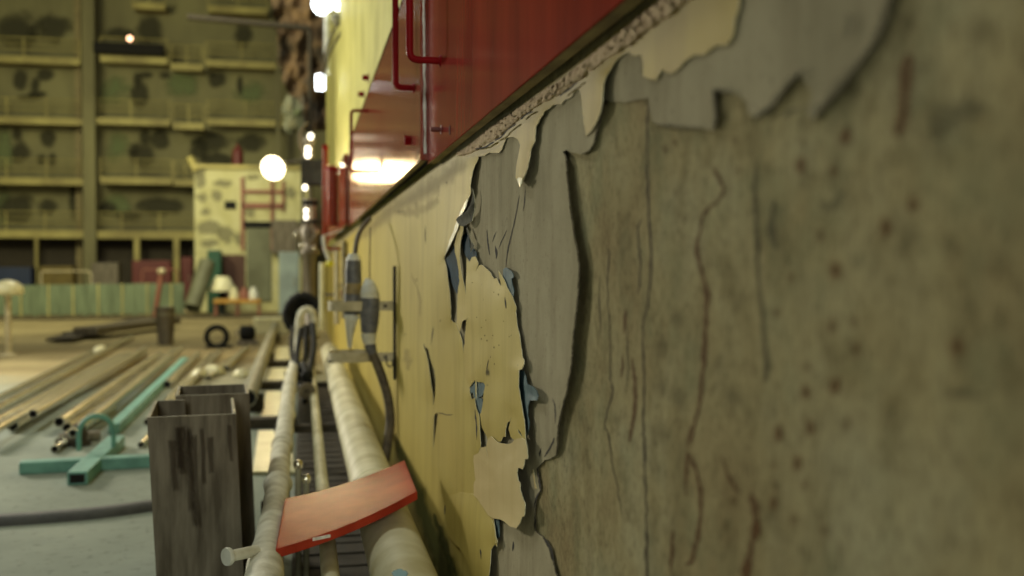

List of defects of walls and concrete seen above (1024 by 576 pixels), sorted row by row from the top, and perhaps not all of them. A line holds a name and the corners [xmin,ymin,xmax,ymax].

peeling [326,0,887,576]